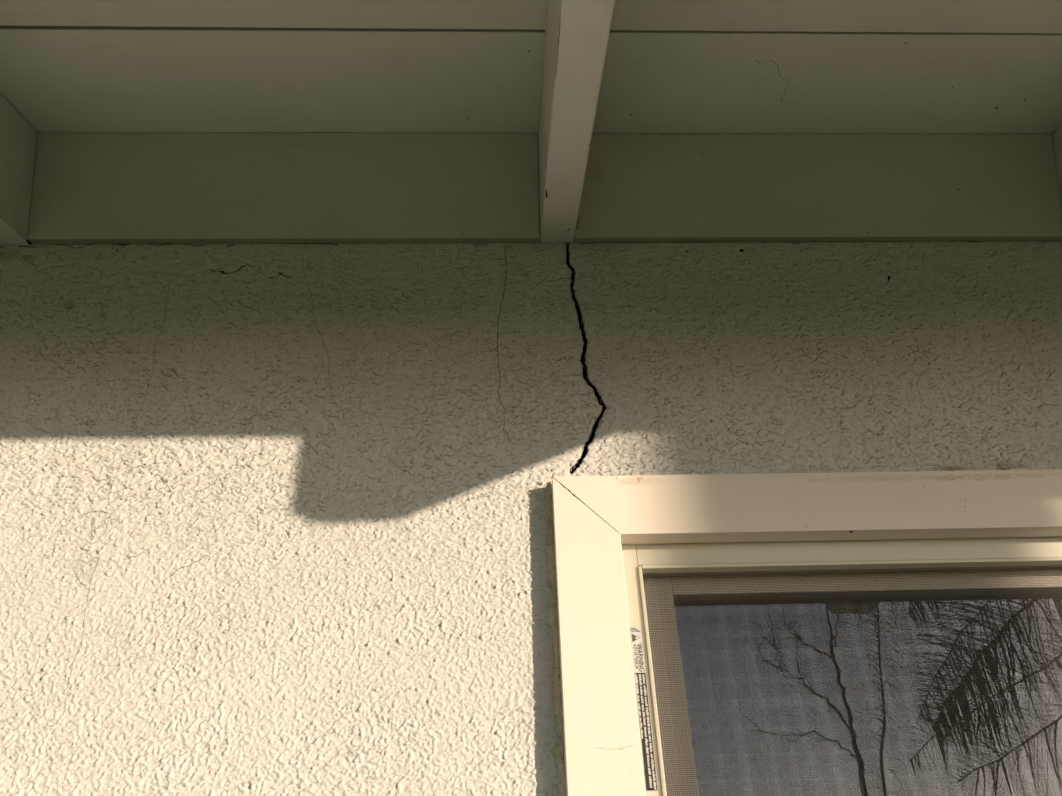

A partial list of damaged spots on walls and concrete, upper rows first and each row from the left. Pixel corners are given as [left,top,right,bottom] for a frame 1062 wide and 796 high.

crack [496,245,512,442]
crack [536,217,606,474]